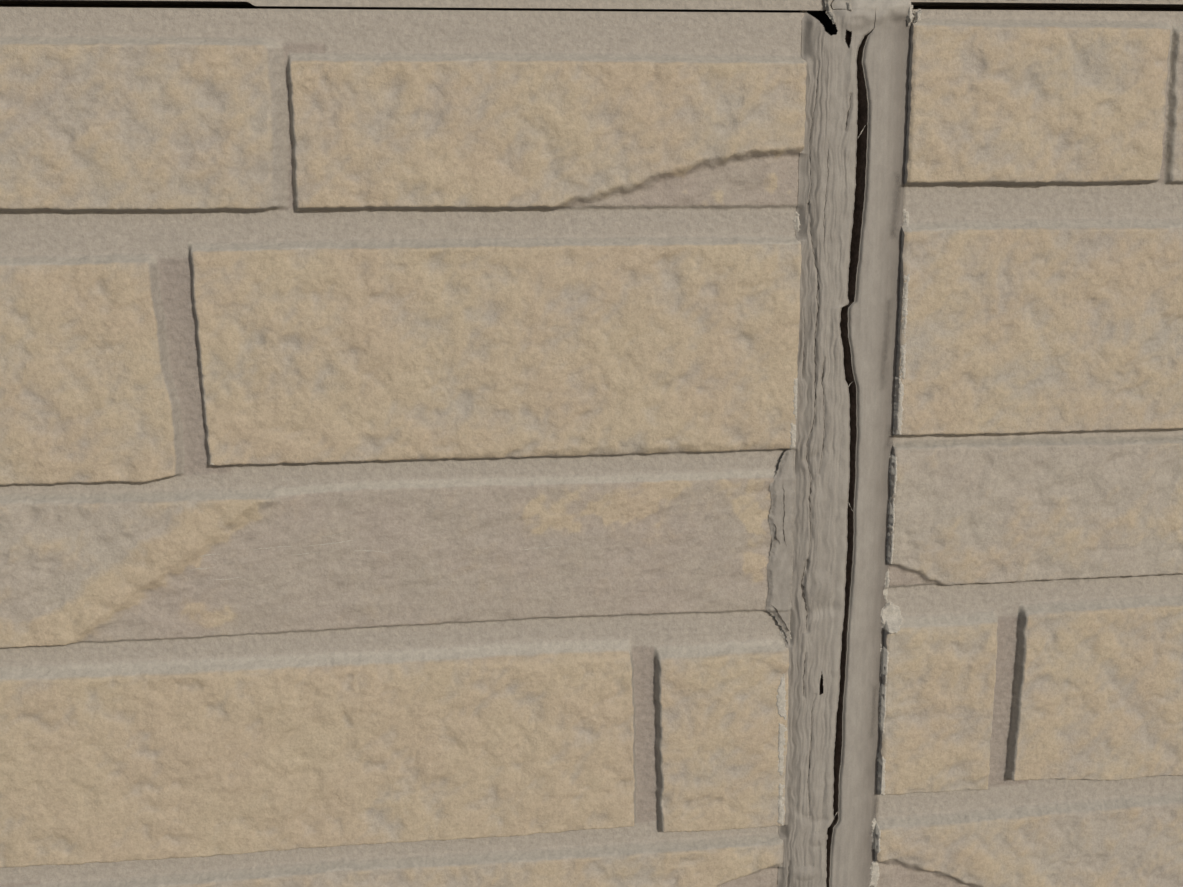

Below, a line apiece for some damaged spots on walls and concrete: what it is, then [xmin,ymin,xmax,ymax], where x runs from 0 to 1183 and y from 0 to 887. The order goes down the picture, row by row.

crack [801,32,870,887]